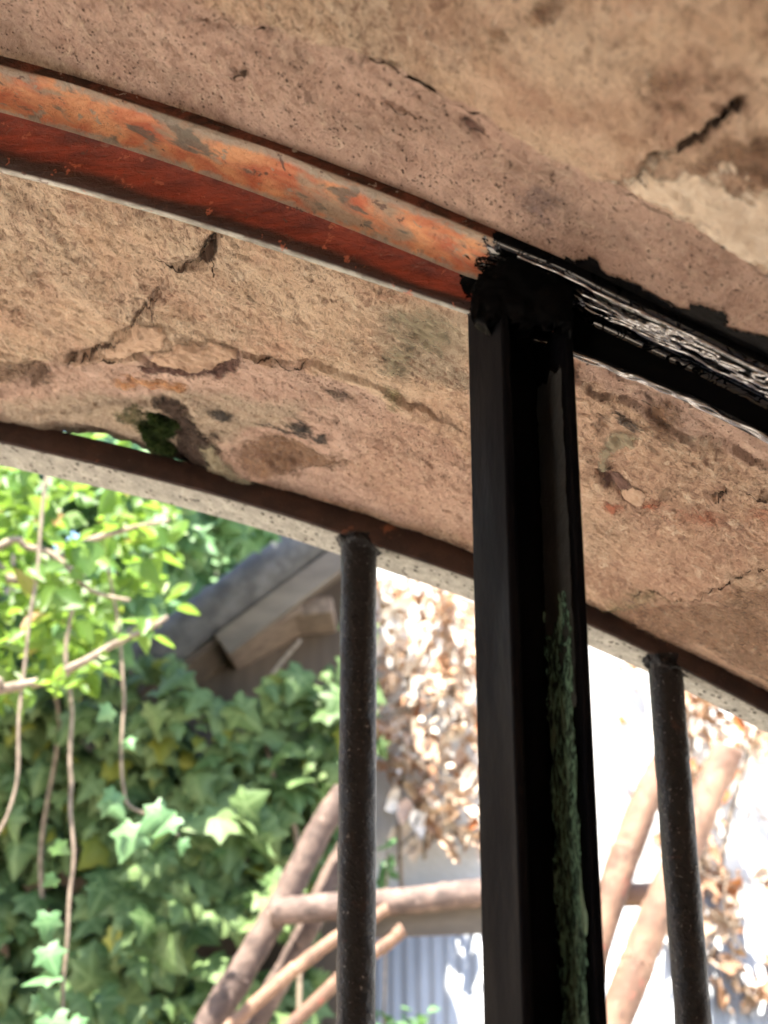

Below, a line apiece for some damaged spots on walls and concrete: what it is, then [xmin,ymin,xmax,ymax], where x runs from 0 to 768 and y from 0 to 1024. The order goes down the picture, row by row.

crack [609,97,742,250]
peeling [613,148,768,268]
crack [157,233,216,278]
crack [7,290,158,375]
crack [240,354,305,371]